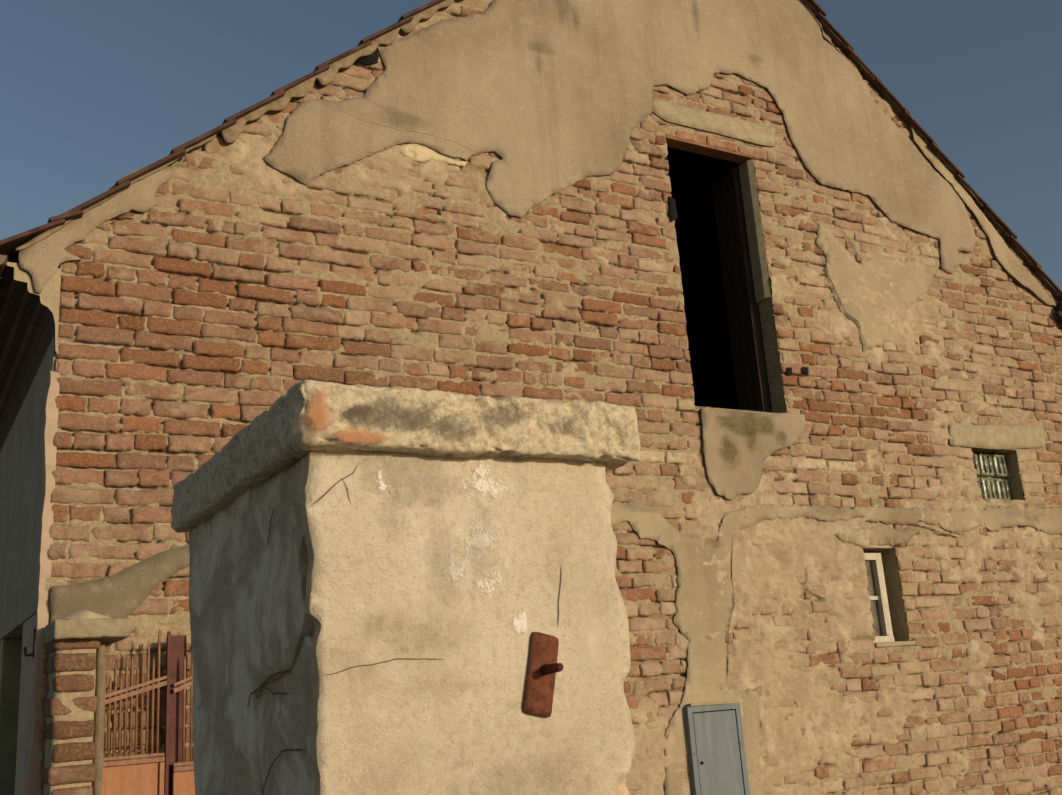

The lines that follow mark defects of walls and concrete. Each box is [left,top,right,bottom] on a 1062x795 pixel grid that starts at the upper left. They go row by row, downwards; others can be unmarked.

flaking render [263,0,1056,352]
flaking render [18,167,176,294]
spalling [785,367,809,375]
spalling [307,389,388,443]
crack [311,465,358,506]
flaking render [50,544,190,623]
flaking render [611,407,1062,795]
crack [247,670,289,708]
crack [326,658,444,675]
crack [263,748,302,794]